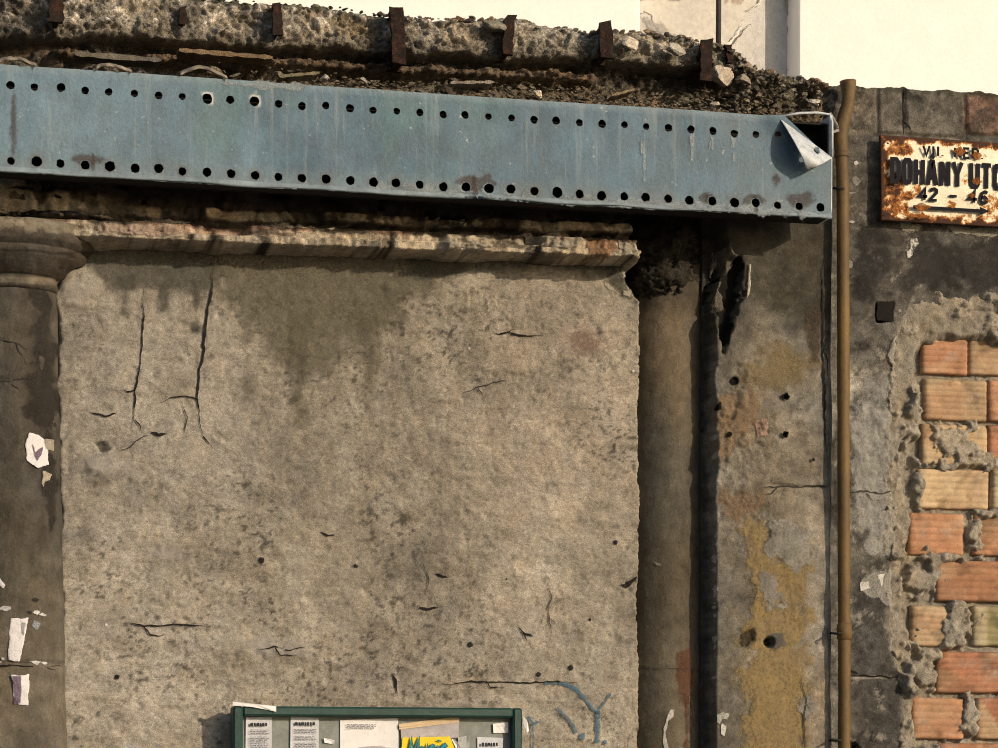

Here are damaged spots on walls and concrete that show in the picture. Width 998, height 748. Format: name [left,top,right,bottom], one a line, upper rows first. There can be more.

spalling [640,0,763,46]
crack [90,255,215,450]
water stain [86,249,539,420]
water stain [554,265,633,299]
spalling [703,246,751,346]
spalling [875,301,894,323]
spalling [887,336,897,430]
spalling [764,518,816,574]
spalling [759,571,787,611]
crack [128,622,206,637]
spalling [741,632,787,650]